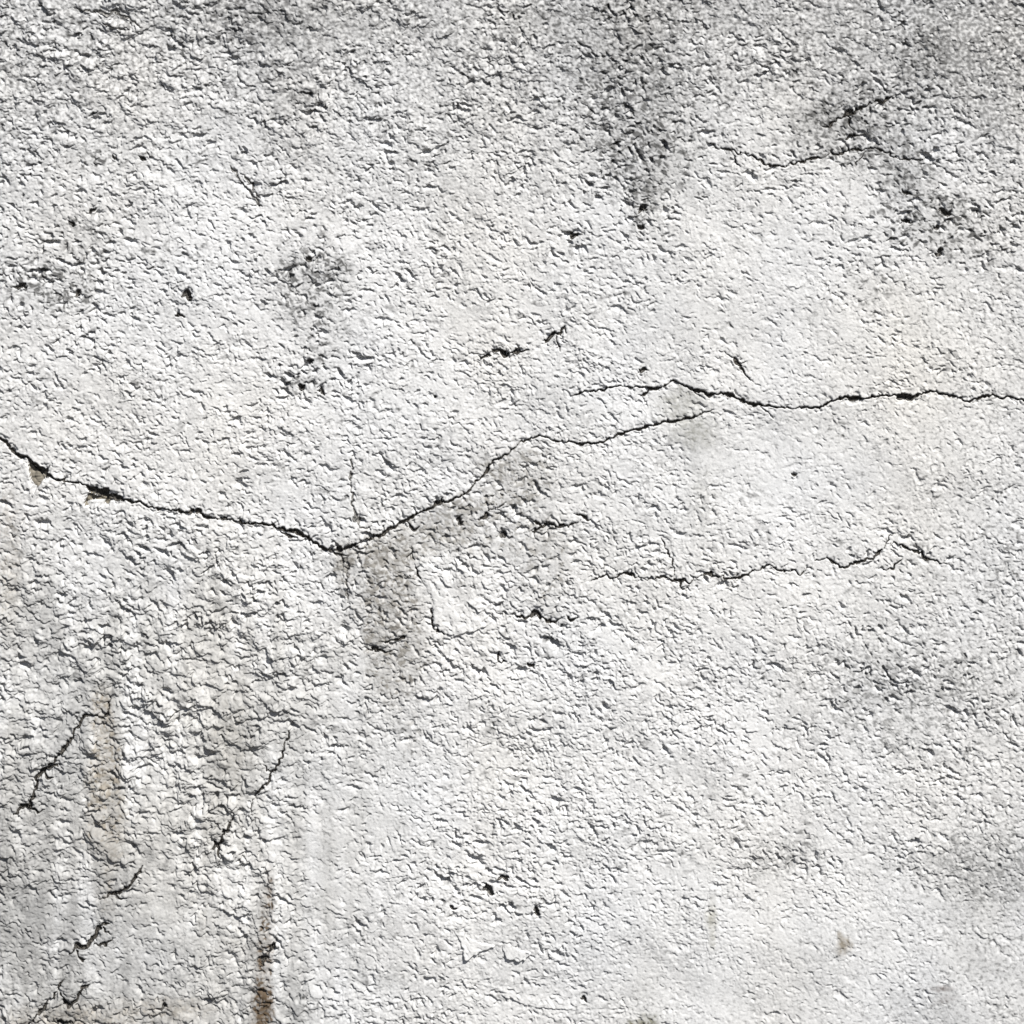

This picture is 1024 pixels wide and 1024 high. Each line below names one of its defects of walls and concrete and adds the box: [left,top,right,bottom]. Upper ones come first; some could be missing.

crack [711,97,926,168]
crack [0,352,1024,599]
crack [13,696,111,815]
crack [212,729,291,863]